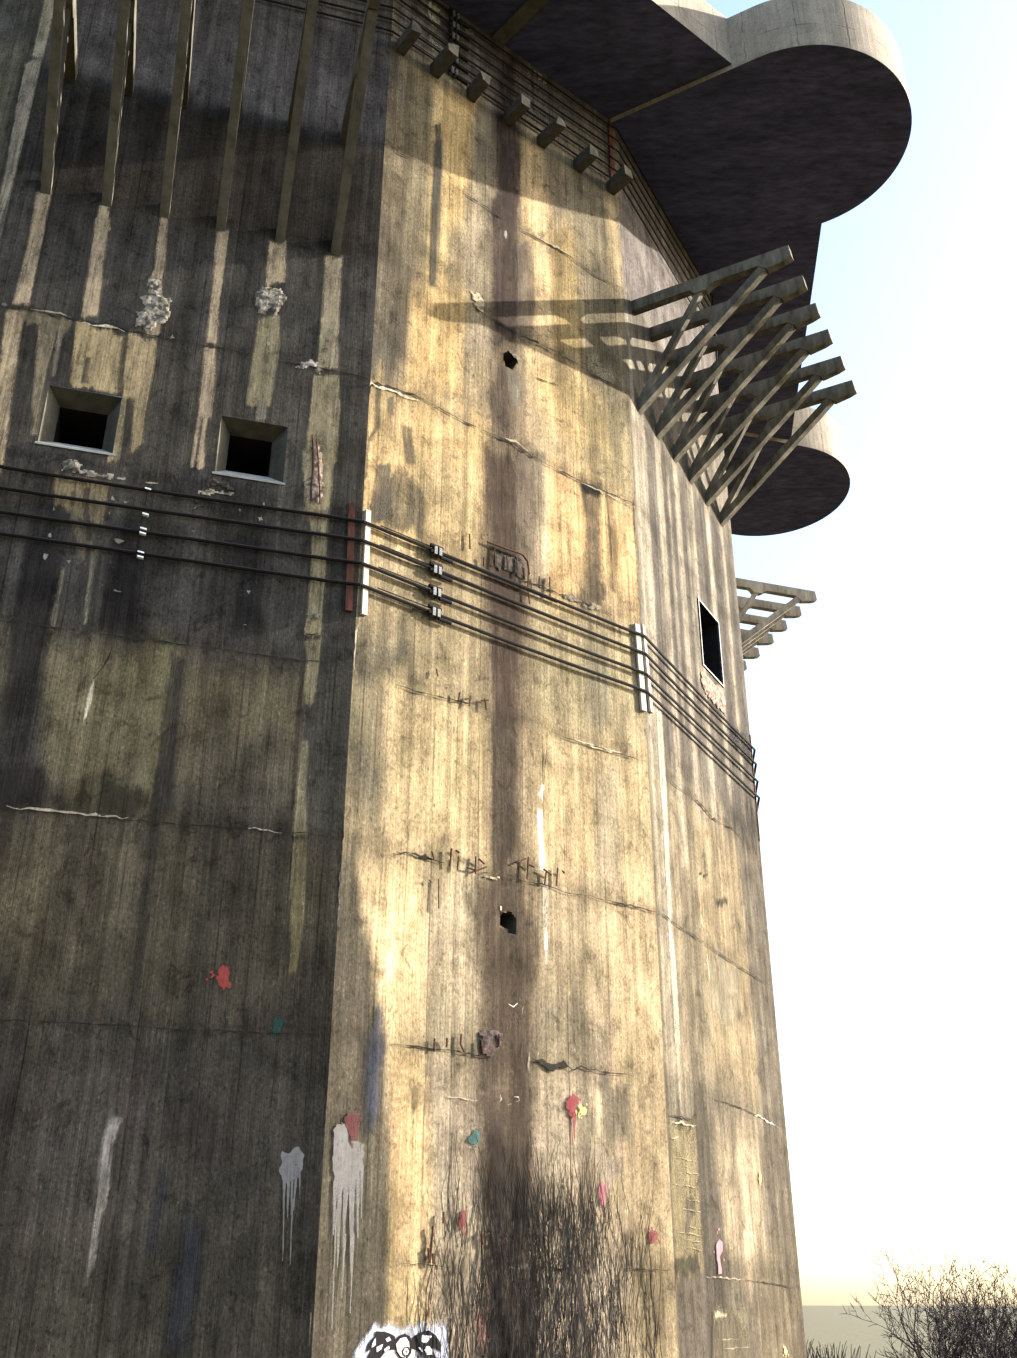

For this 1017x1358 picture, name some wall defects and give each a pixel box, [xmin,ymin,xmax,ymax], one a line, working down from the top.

water stain [430,124,442,286]
water stain [493,58,534,347]
spalling [134,278,172,333]
spalling [255,285,287,319]
water stain [469,366,548,1358]
crack [528,1052,634,1077]